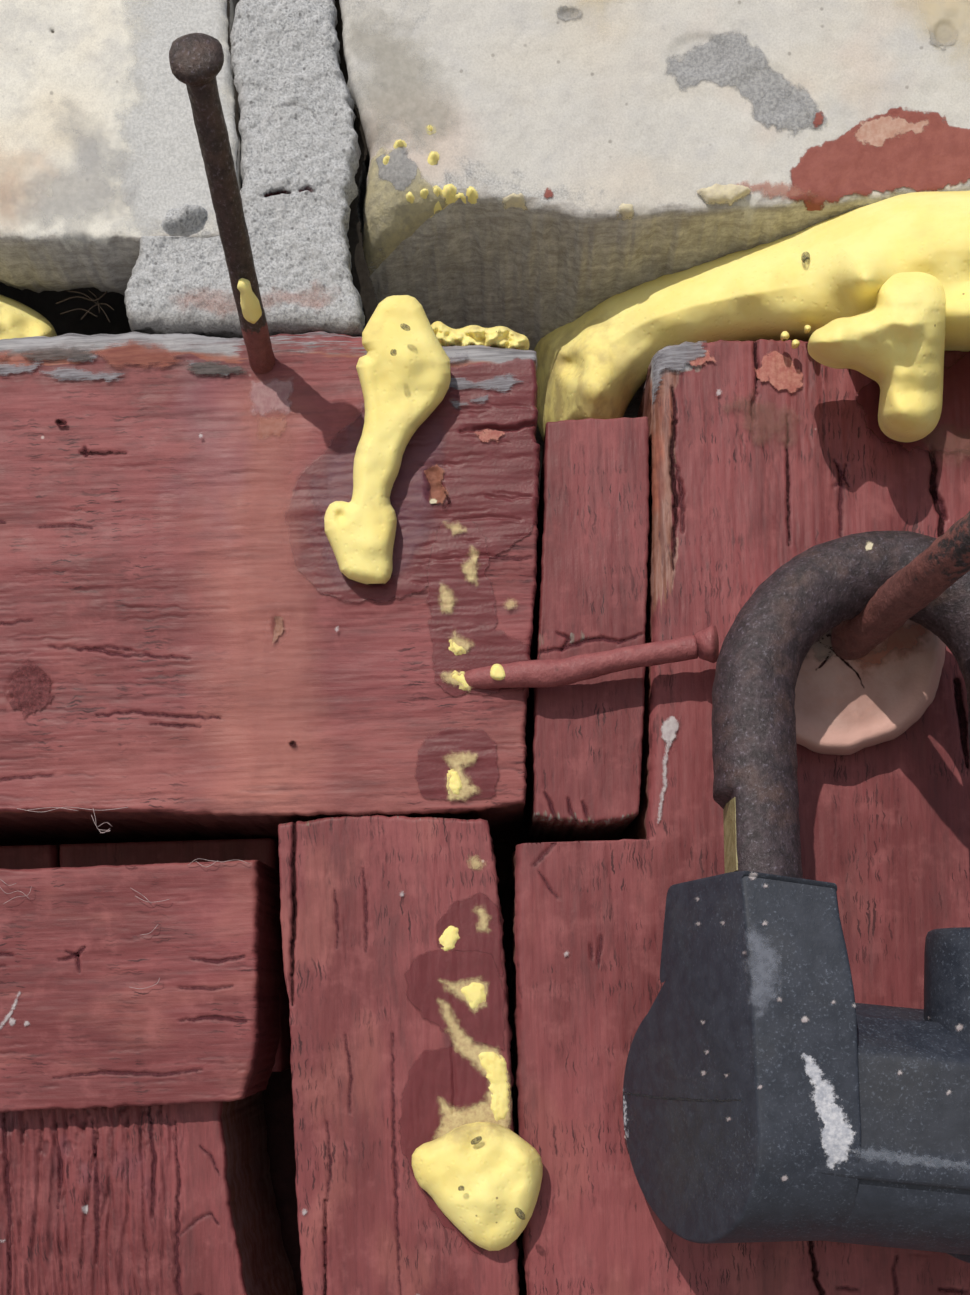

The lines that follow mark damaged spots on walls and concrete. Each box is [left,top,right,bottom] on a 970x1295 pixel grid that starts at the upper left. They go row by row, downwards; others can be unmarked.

spalling [666,33,826,136]
peeling [855,116,928,147]
peeling [0,341,246,382]
peeling [687,350,716,366]
peeling [755,351,803,393]
leakage [284,358,540,696]
crack [670,387,684,570]
crack [929,451,945,536]
leakage [415,728,499,801]
leakage [399,893,505,1254]
crack [809,1241,847,1295]